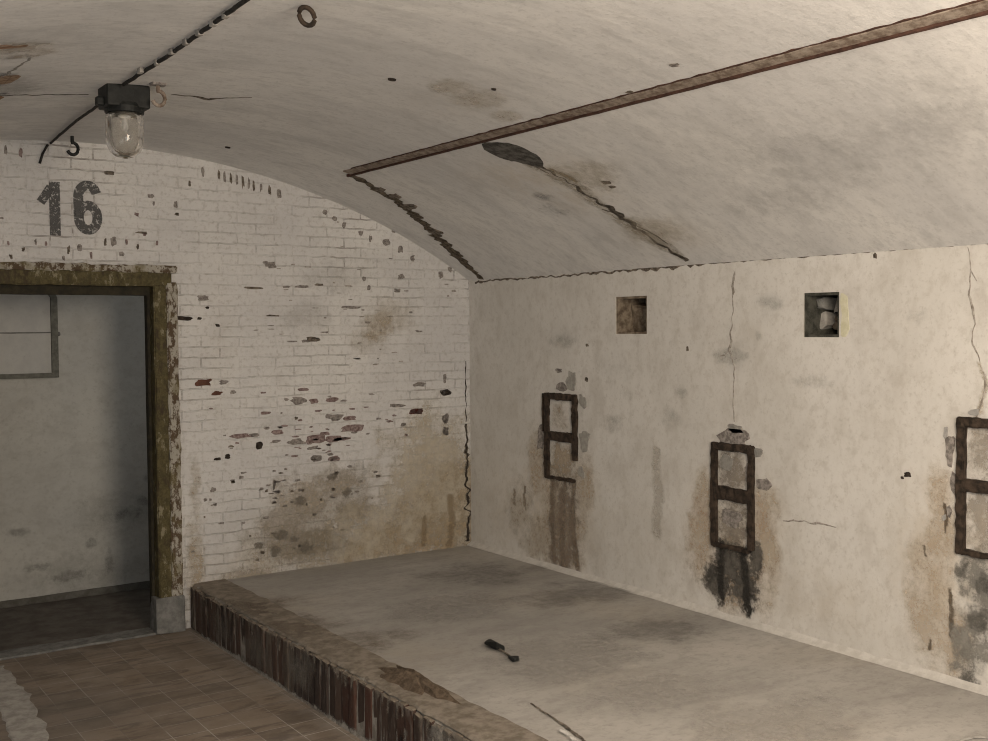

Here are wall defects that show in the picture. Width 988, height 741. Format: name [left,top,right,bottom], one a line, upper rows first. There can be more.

peeling [0,231,209,596]
peeling [195,379,236,395]
peeling [259,468,304,507]
peeling [214,388,370,475]
water stain [228,405,471,579]
crack [948,246,988,417]
water stain [908,480,988,683]